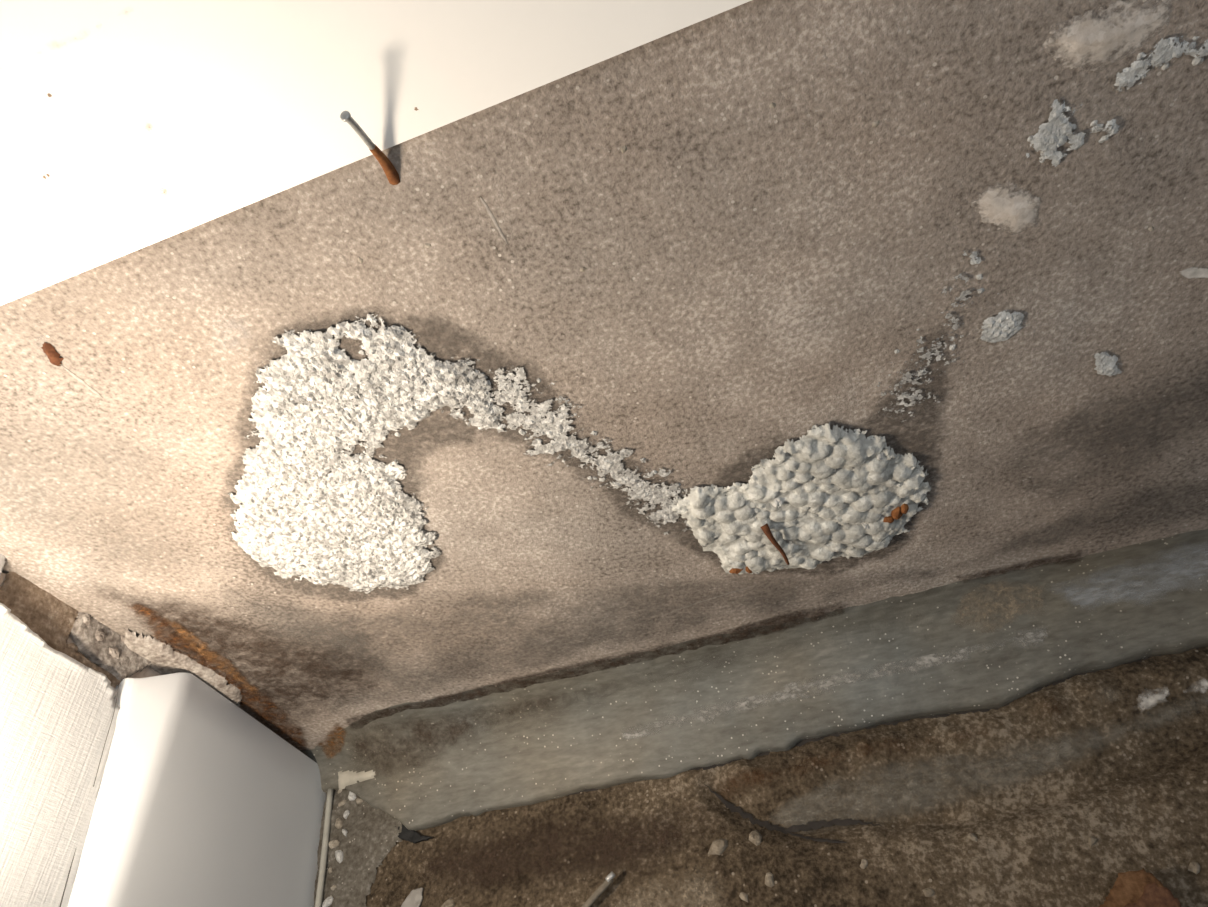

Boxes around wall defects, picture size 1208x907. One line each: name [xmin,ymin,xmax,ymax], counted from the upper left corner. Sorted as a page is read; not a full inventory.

rust [41,342,103,399]
water stain [959,555,1079,619]
water stain [138,604,489,710]
water stain [347,589,842,728]
water stain [622,647,971,740]
water stain [1141,692,1168,708]